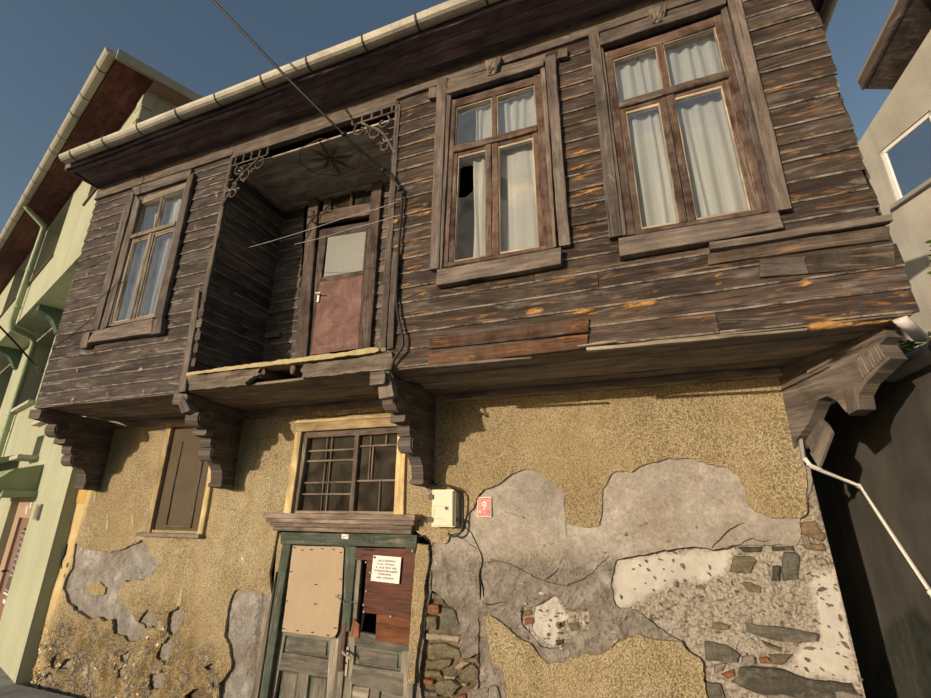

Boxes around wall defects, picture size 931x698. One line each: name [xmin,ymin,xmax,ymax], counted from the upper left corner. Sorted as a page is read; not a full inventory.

peeling [625,300,657,309]
peeling [808,320,889,330]
spalling [30,540,184,698]
spalling [189,583,274,698]
spalling [415,458,801,698]
crack [463,523,771,689]